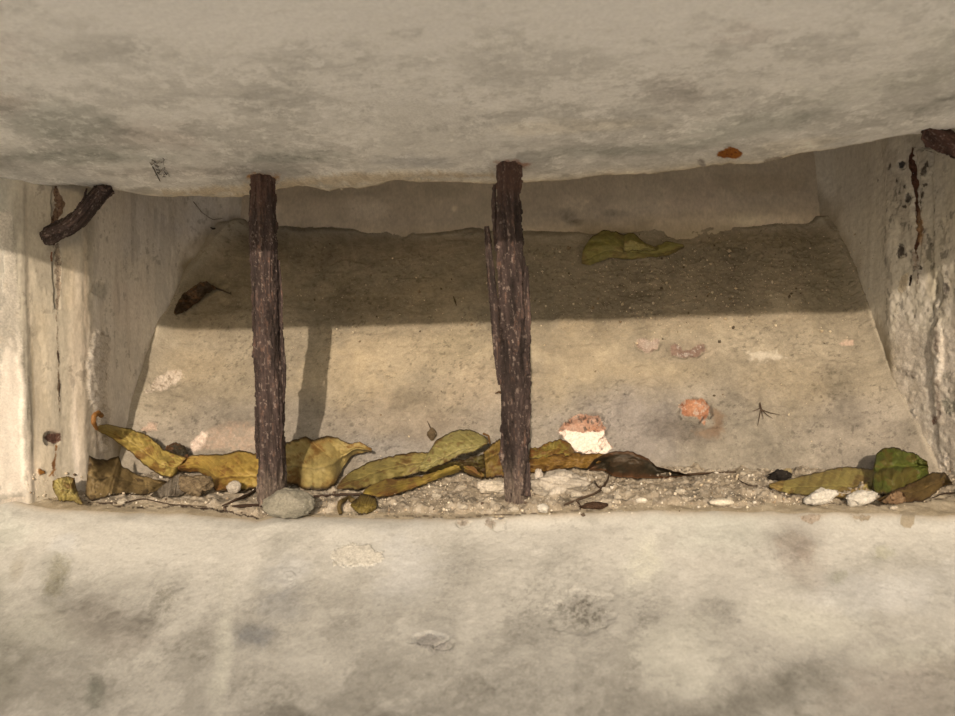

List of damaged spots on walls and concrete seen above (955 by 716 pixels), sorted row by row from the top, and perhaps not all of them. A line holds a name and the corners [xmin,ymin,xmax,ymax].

corrosion [702,141,757,163]
crack [50,185,66,417]
spalling [677,397,710,426]
spalling [555,413,613,454]